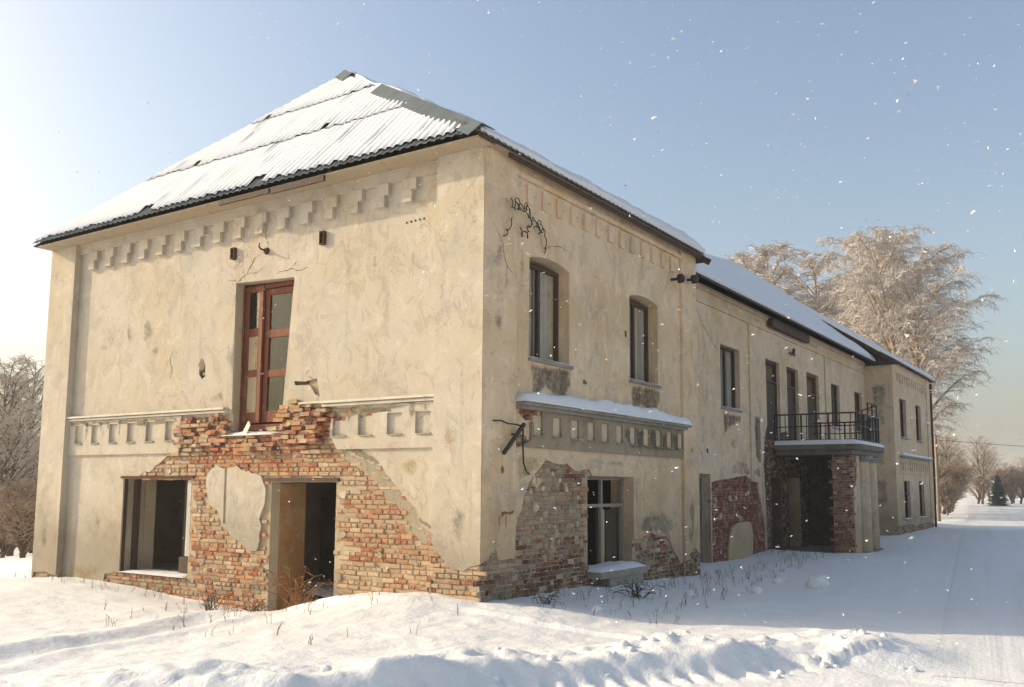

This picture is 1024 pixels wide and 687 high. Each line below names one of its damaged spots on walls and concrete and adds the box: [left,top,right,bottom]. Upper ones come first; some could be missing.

crack [229,224,305,281]
leakage [533,368,570,396]
leakage [632,387,659,408]
flaking render [103,381,599,611]
flaking render [708,430,810,563]
flaking render [632,534,701,581]